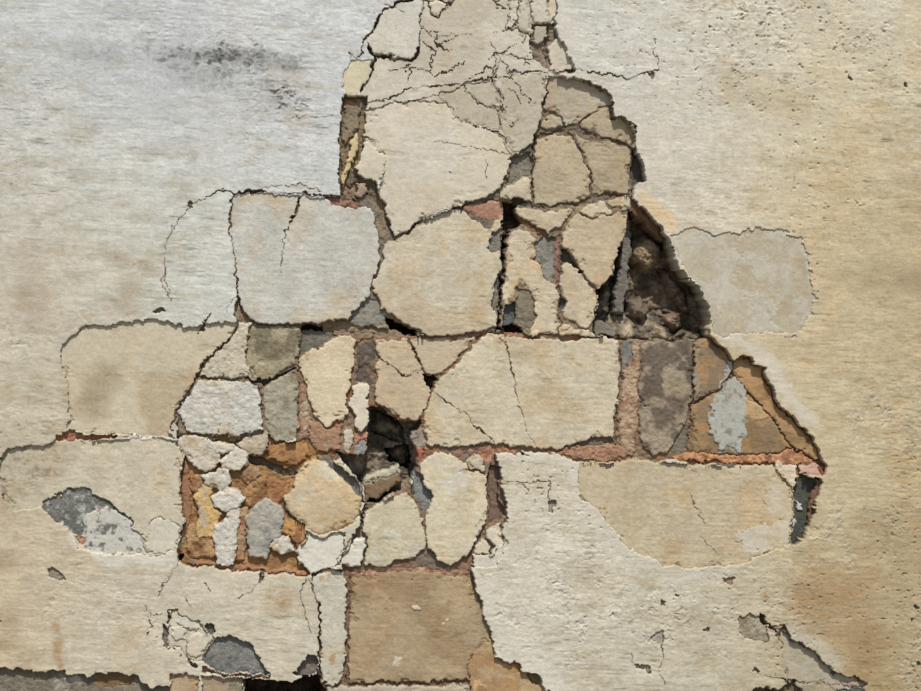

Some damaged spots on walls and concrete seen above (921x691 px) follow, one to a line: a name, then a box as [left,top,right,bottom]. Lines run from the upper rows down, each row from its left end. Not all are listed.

flaking render [0,319,471,691]
crack [160,136,379,444]
crack [339,503,470,688]
crack [348,0,660,296]
flaking render [229,0,825,691]
crack [556,237,564,334]
crack [614,343,624,443]
flaking render [738,613,865,691]